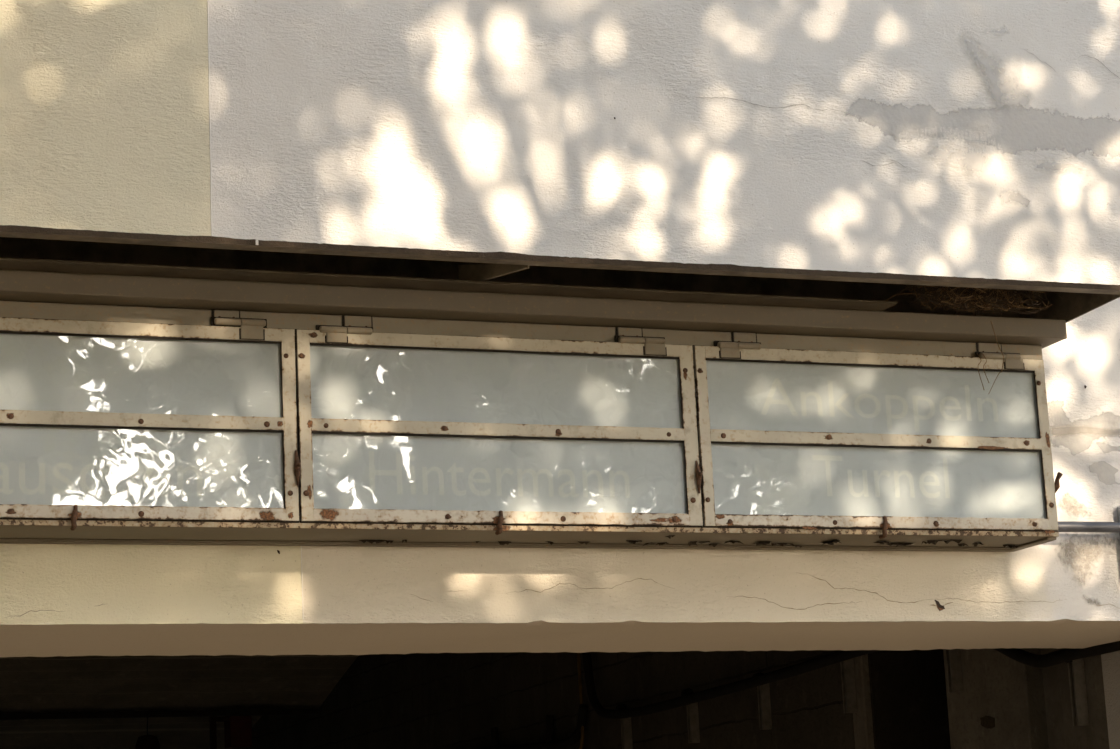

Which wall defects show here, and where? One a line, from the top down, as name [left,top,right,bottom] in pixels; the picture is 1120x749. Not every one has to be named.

peeling [846,99,1120,157]
peeling [1089,442,1120,484]
crack [727,573,1117,610]